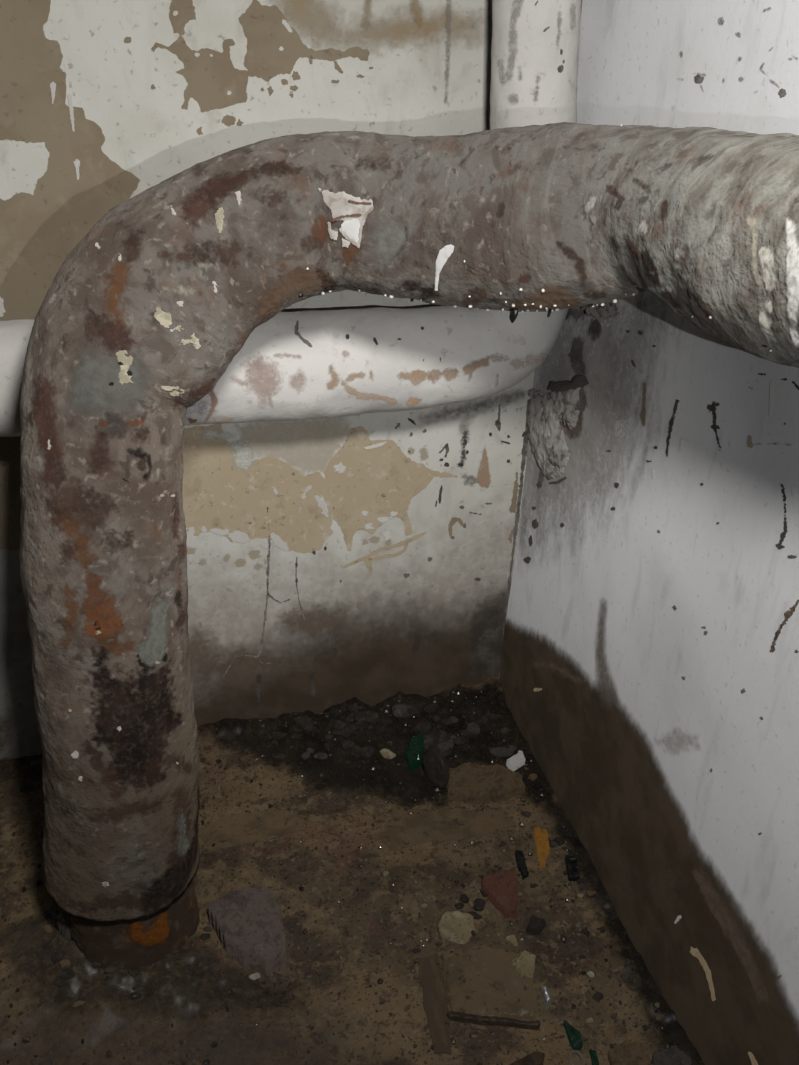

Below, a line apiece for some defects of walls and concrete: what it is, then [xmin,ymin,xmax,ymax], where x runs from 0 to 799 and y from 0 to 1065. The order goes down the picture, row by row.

peeling [151,0,373,126]
peeling [0,0,140,321]
peeling [215,208,224,233]
peeling [151,286,201,349]
peeling [161,386,184,396]
peeling [0,436,22,550]
peeling [160,424,458,570]
peeling [448,505,466,539]
water stain [189,557,799,1065]